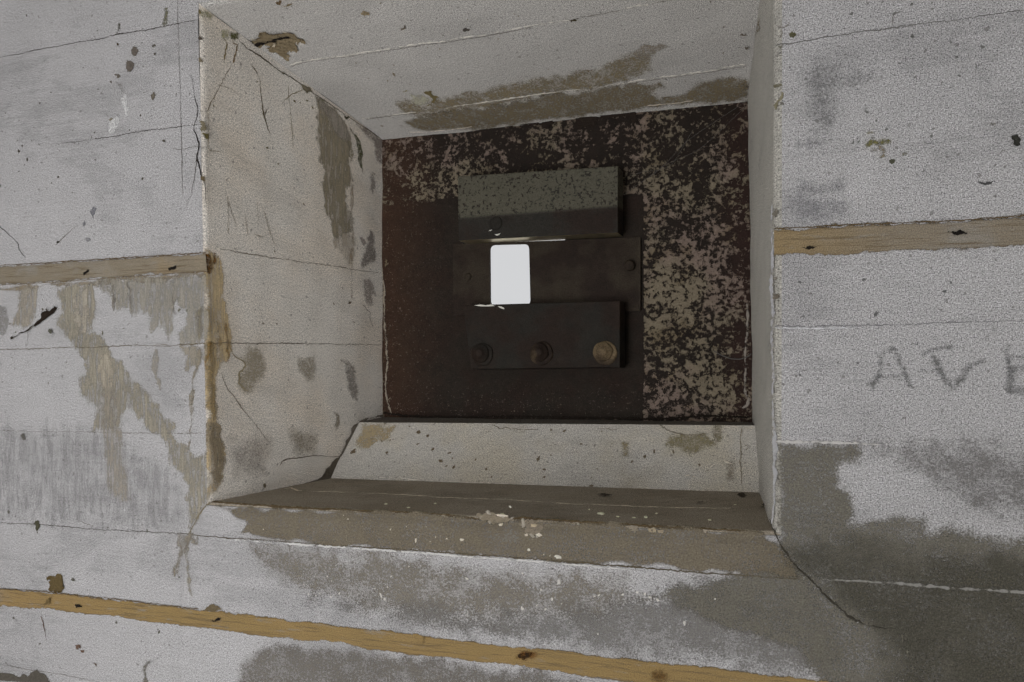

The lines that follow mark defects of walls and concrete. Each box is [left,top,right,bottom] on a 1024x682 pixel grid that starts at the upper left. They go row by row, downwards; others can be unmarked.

crack [0,0,381,208]
spalling [251,32,306,61]
damp [316,97,382,263]
corrosion [505,121,553,129]
damp [395,44,748,131]
corrosion [575,112,637,129]
damp [0,272,209,592]
crack [2,501,480,551]
damp [219,440,1024,682]
crack [513,516,895,629]